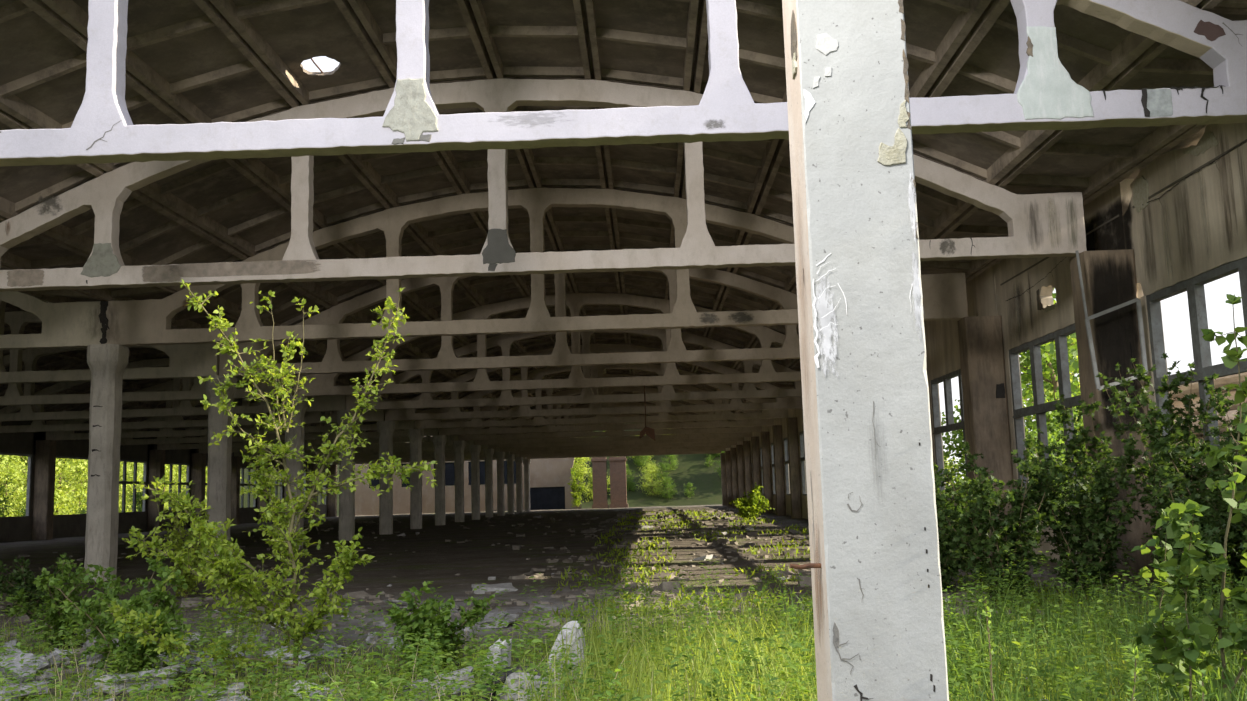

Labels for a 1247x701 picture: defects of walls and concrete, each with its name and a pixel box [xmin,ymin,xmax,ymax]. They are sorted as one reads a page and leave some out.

spalling [382,78,439,144]
spalling [791,10,839,121]
spalling [1017,26,1094,120]
spalling [1194,20,1226,41]
spalling [482,229,516,271]
crack [810,473,874,701]